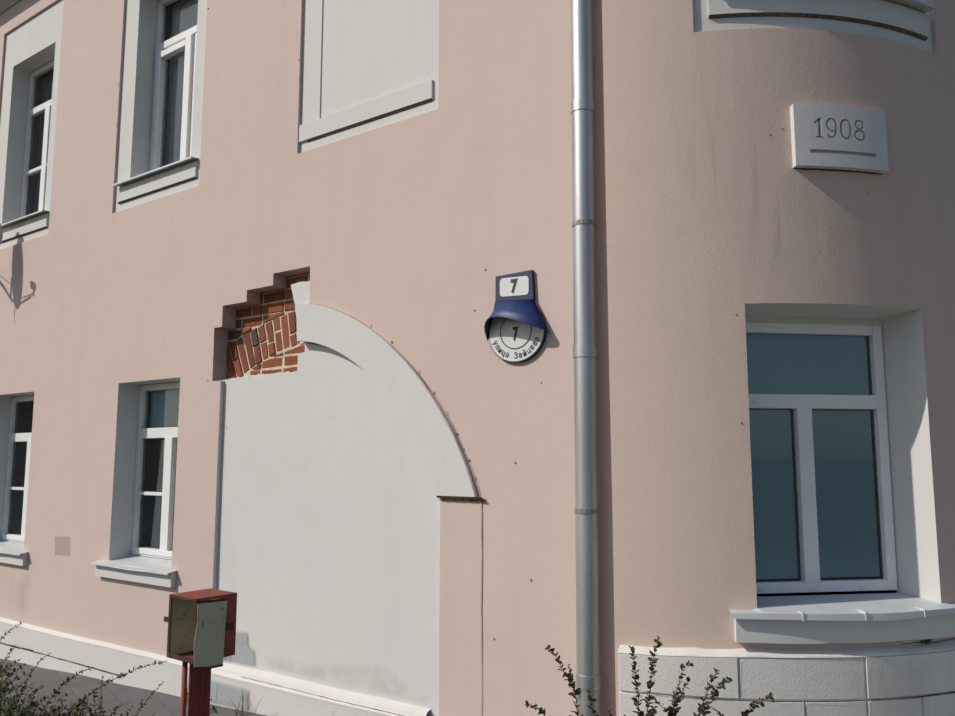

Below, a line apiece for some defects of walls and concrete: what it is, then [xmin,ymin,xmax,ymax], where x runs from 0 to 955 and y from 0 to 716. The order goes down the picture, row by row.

flaking render [225,272,484,500]
crack [655,659,955,716]